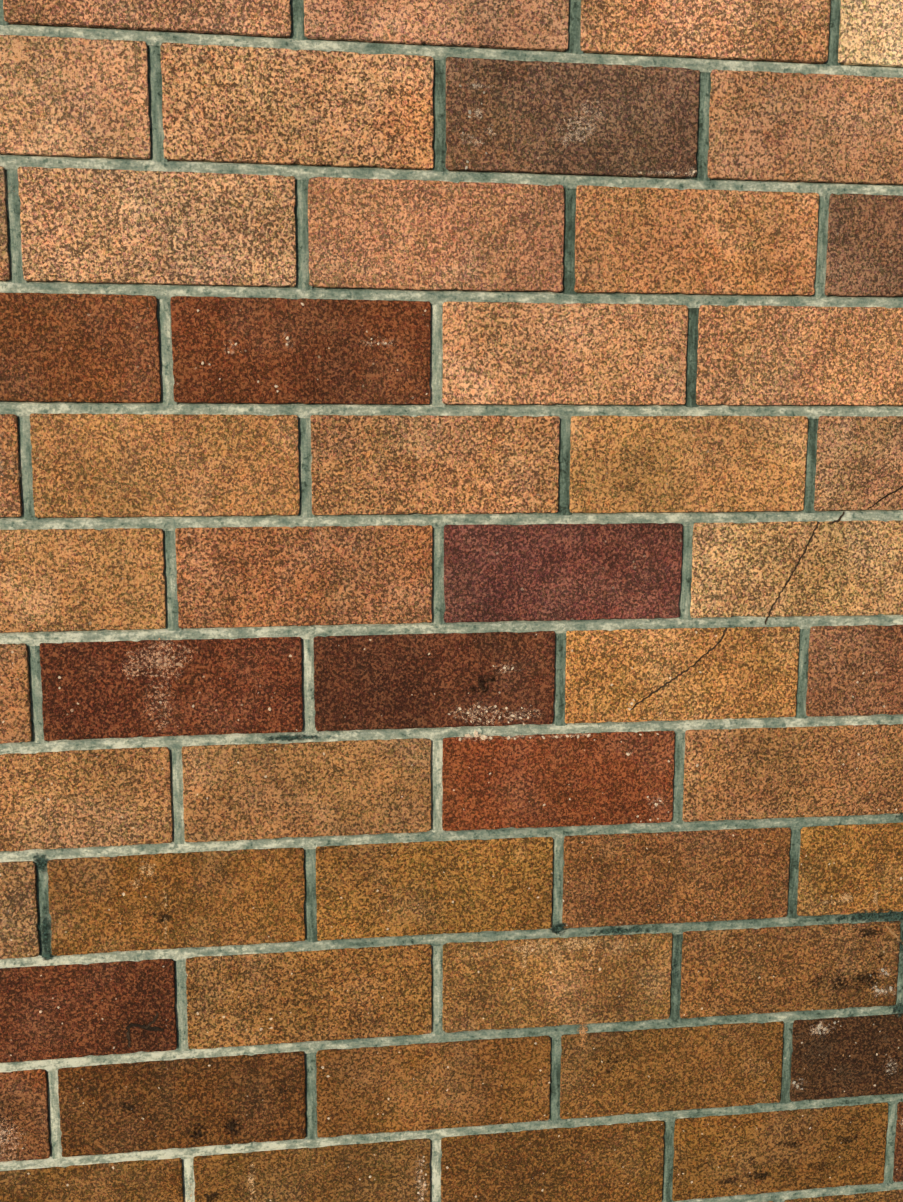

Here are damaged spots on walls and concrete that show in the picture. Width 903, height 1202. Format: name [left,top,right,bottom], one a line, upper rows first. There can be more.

crack [765,486,903,625]
crack [628,627,727,710]